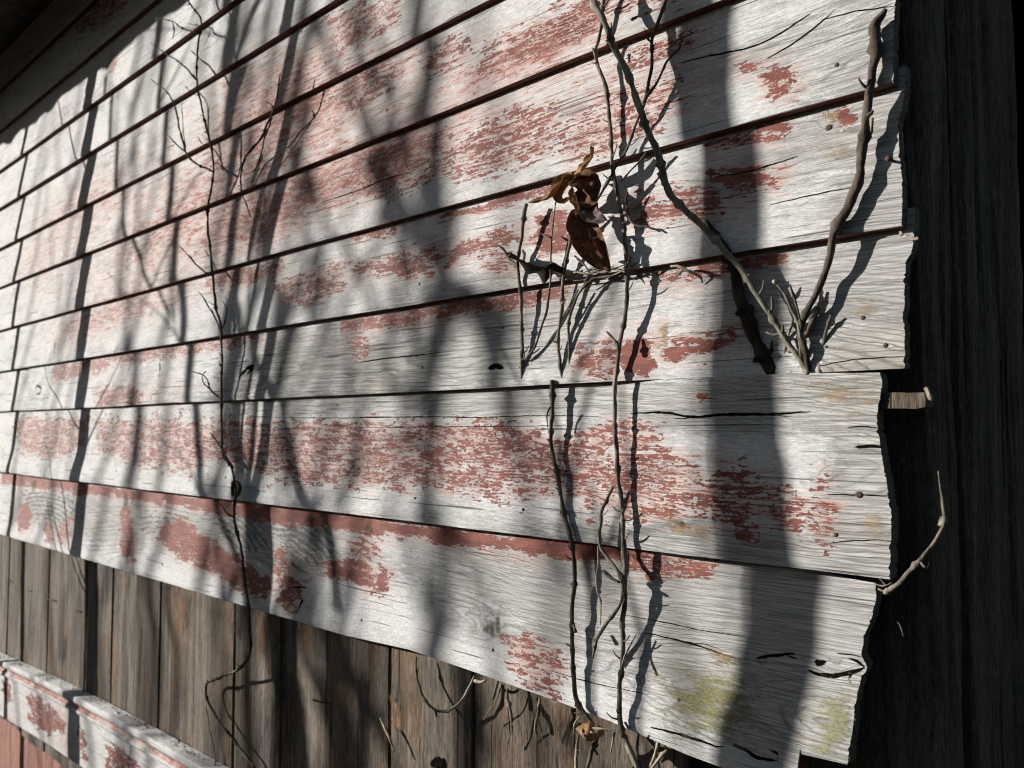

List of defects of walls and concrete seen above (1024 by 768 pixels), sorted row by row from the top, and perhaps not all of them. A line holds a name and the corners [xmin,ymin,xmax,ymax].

peeling [418,0,683,81]
crack [682,6,893,63]
peeling [351,28,699,209]
peeling [733,60,797,103]
peeling [633,165,779,233]
peeling [204,209,573,310]
peeling [340,286,569,366]
crack [629,411,812,419]
peeling [0,334,840,614]
peeling [499,631,568,706]
crack [626,615,864,683]
peeling [1,675,88,761]